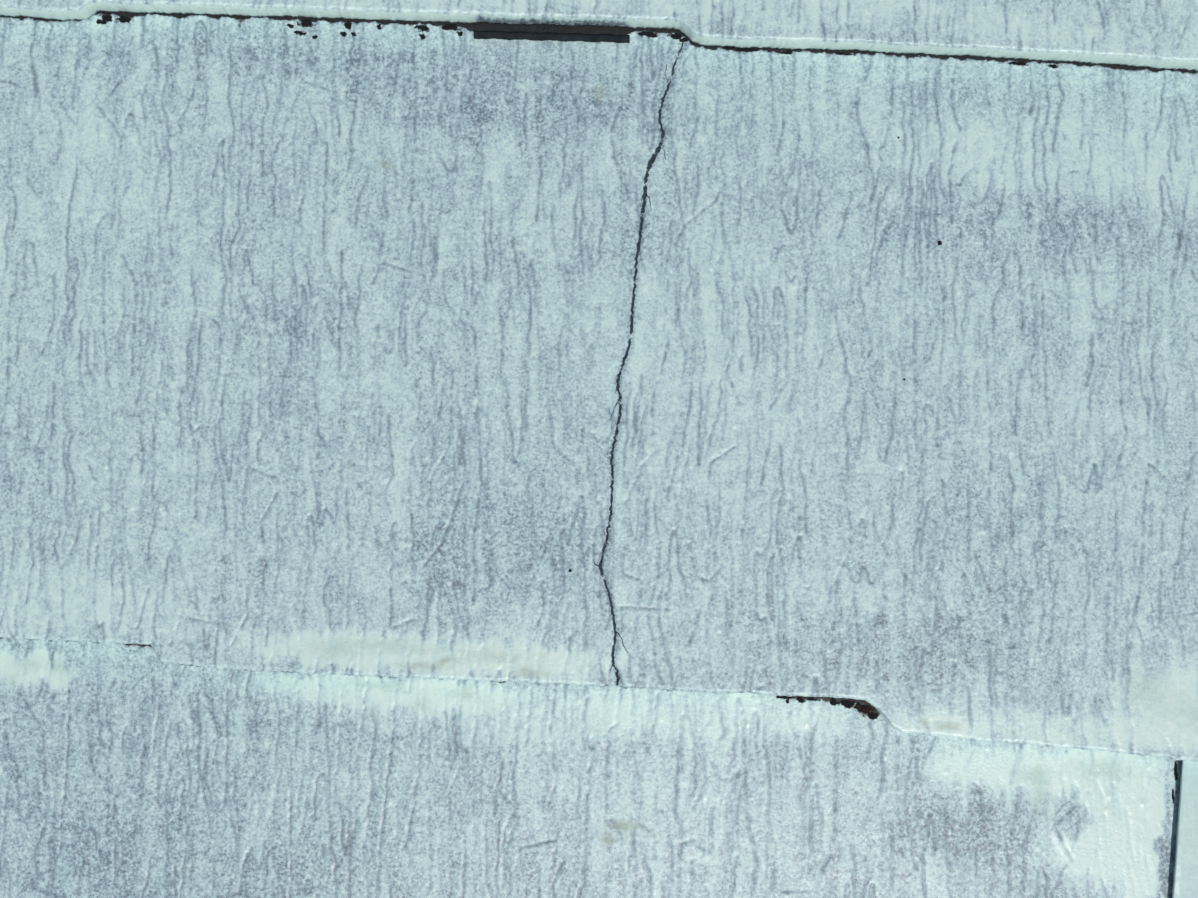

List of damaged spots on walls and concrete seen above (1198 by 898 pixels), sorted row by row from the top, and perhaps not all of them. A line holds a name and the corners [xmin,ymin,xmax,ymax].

crack [593,43,684,685]